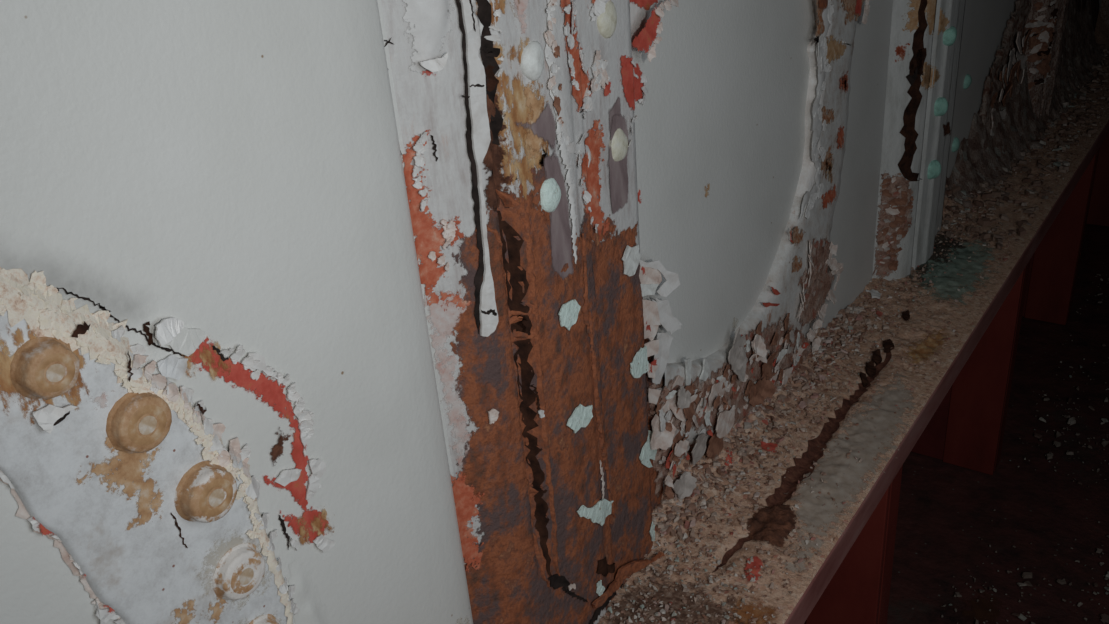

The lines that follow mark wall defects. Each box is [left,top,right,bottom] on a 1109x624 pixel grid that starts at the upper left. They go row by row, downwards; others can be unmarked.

peeling [544,0,679,242]
corrosion [814,0,870,64]
crack [898,0,928,181]
corrosion [0,325,89,424]
corrosion [76,437,164,530]
peeling [0,267,335,624]
peeling [402,0,499,572]
crack [456,0,623,624]
corrosion [446,37,844,624]
peeling [639,260,682,404]
peeling [744,556,764,582]
corrosion [873,173,914,279]